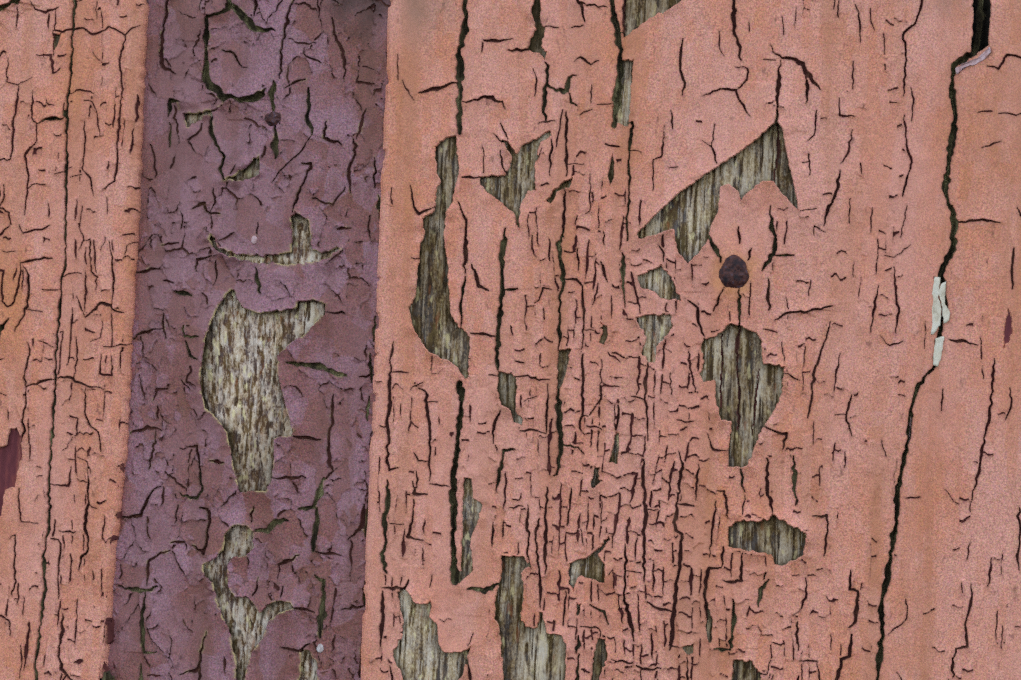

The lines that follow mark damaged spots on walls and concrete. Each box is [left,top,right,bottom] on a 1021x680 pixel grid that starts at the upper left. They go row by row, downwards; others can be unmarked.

peeling [624,0,689,36]
peeling [404,121,626,386]
peeling [622,94,815,362]
peeling [0,418,33,531]
peeling [185,198,351,680]
peeling [387,468,619,680]
peeling [700,314,799,476]
peeling [727,500,821,580]
peeling [717,650,773,680]